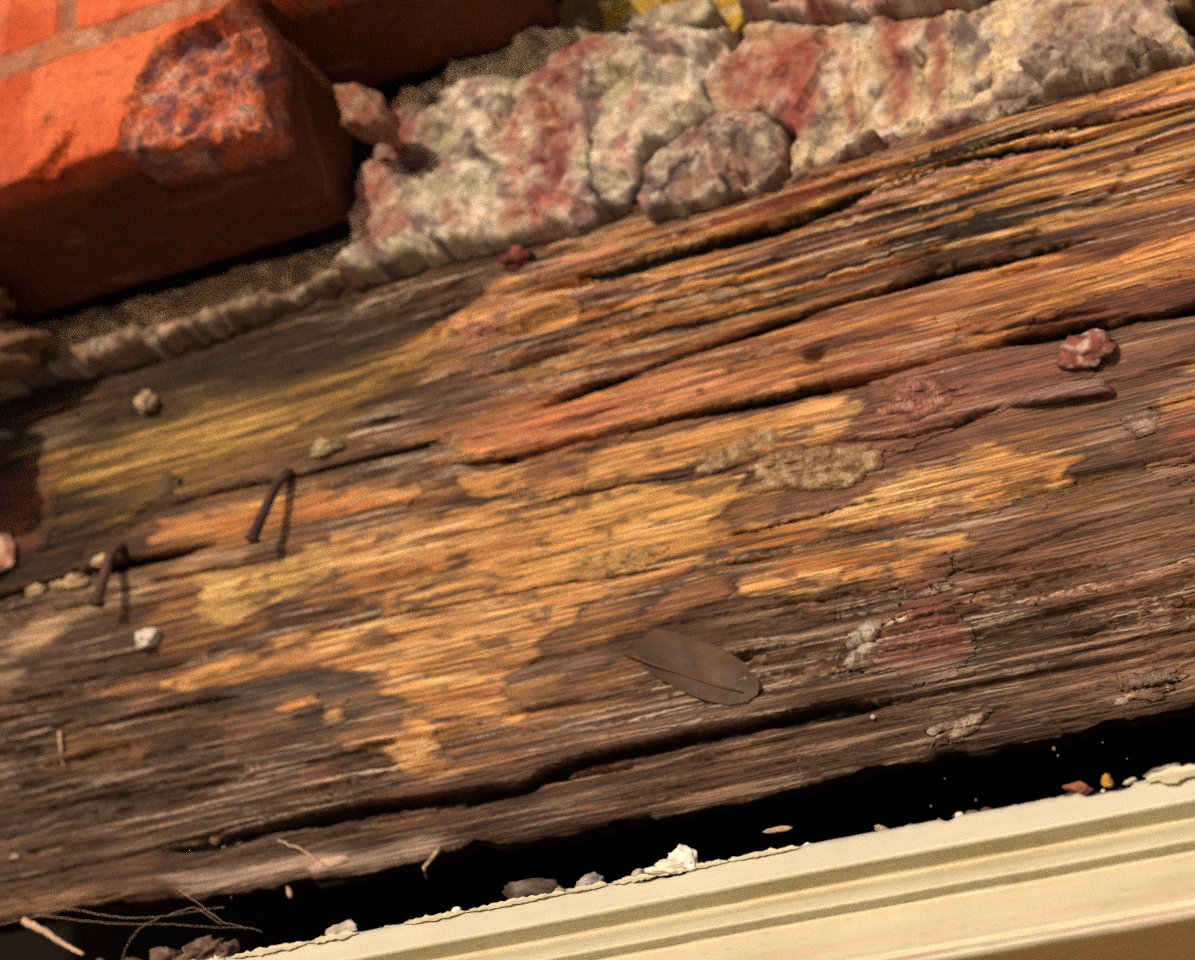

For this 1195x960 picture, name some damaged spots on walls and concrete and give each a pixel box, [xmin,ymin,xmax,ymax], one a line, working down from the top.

spalling [269,0,385,26]
spalling [114,0,299,193]
crack [161,693,912,855]